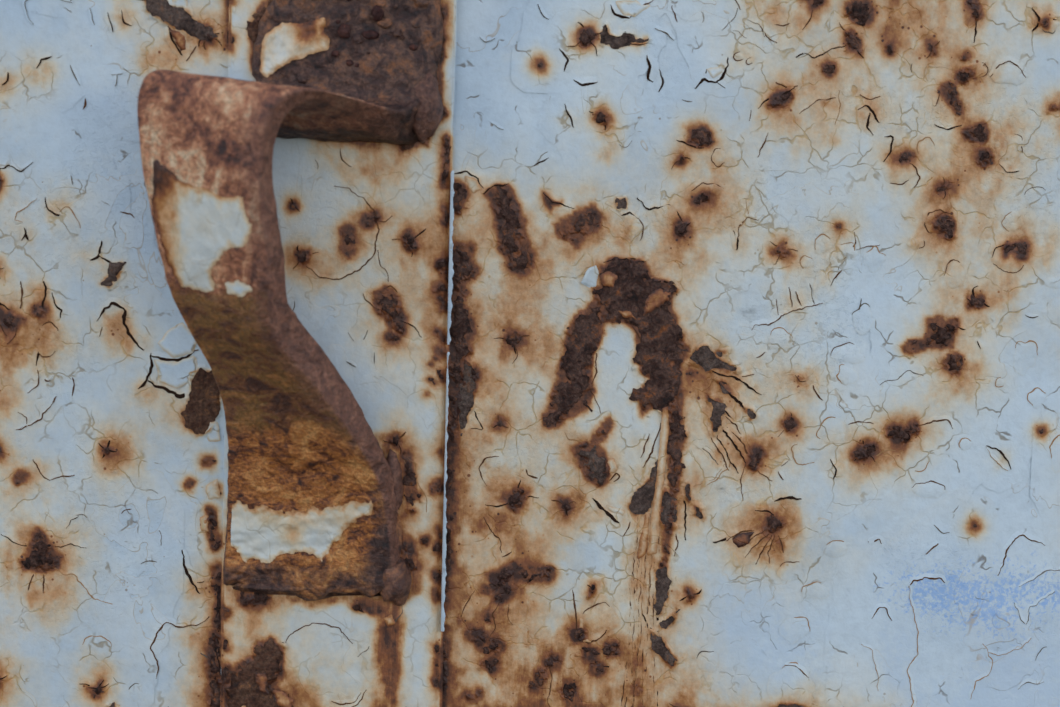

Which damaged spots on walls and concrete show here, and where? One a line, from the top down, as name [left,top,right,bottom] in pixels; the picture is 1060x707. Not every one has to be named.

crack [70,65,87,109]
crack [534,46,598,166]
crack [611,0,932,171]
crack [12,176,178,396]
corrosion [272,0,1060,707]
crack [637,195,871,334]
crack [33,458,75,480]
crack [141,530,221,674]
corrosion [221,422,410,707]
crack [566,495,630,536]
crack [741,458,817,549]
crack [734,661,820,707]